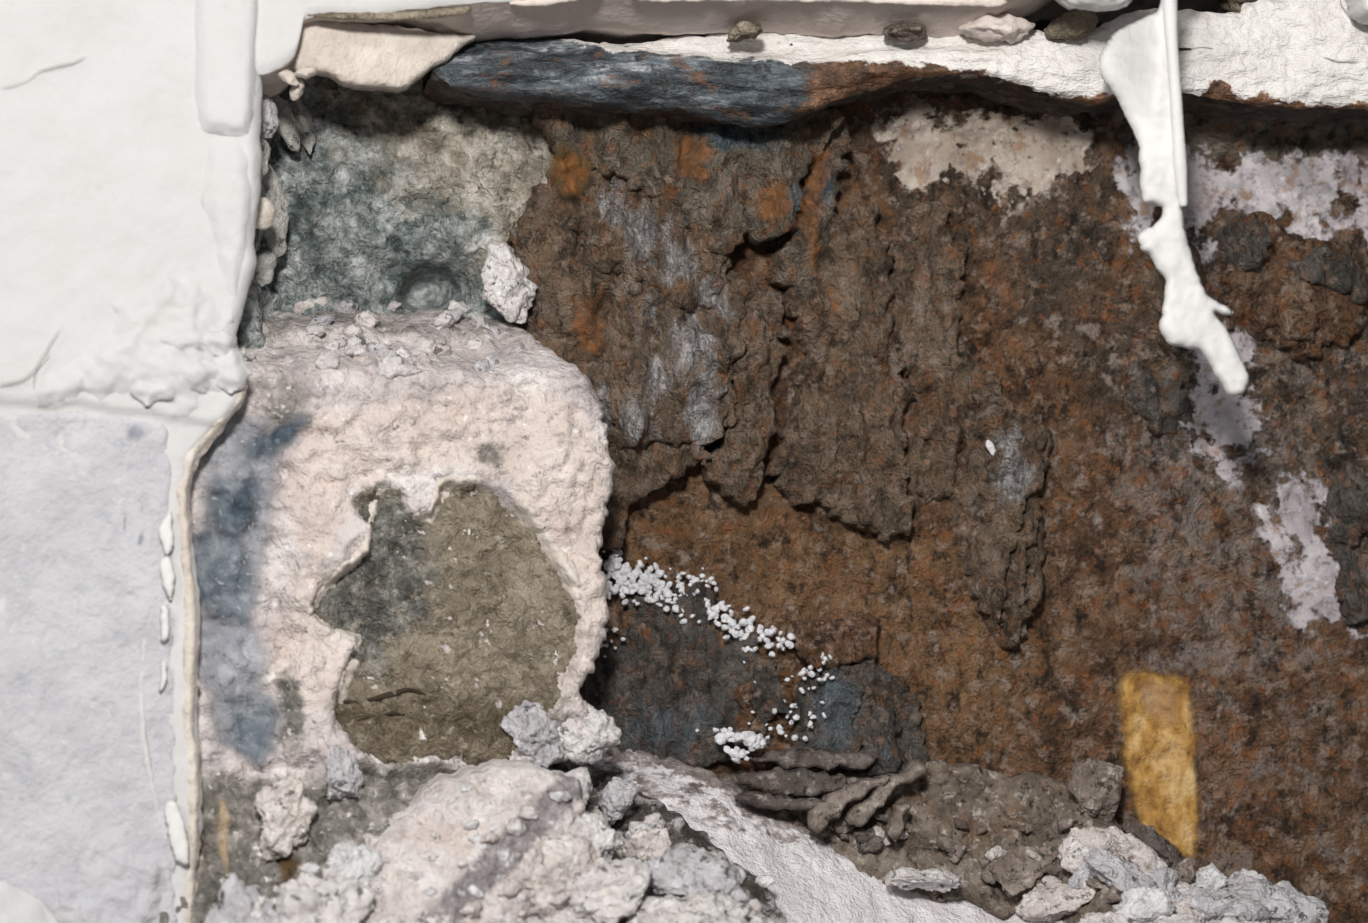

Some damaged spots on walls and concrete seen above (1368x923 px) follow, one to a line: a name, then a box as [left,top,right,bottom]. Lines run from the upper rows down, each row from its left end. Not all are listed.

flaking render [275,6,476,101]
peeling [1182,143,1368,264]
rust [1136,252,1166,316]
rust [1188,211,1368,367]
peeling [506,104,1158,649]
rust [1125,366,1200,462]
spalling [308,474,582,766]
leakage [599,549,795,664]
peeling [579,578,930,778]
leakage [695,652,835,763]
rust [1120,671,1198,855]
rust [1325,459,1368,626]